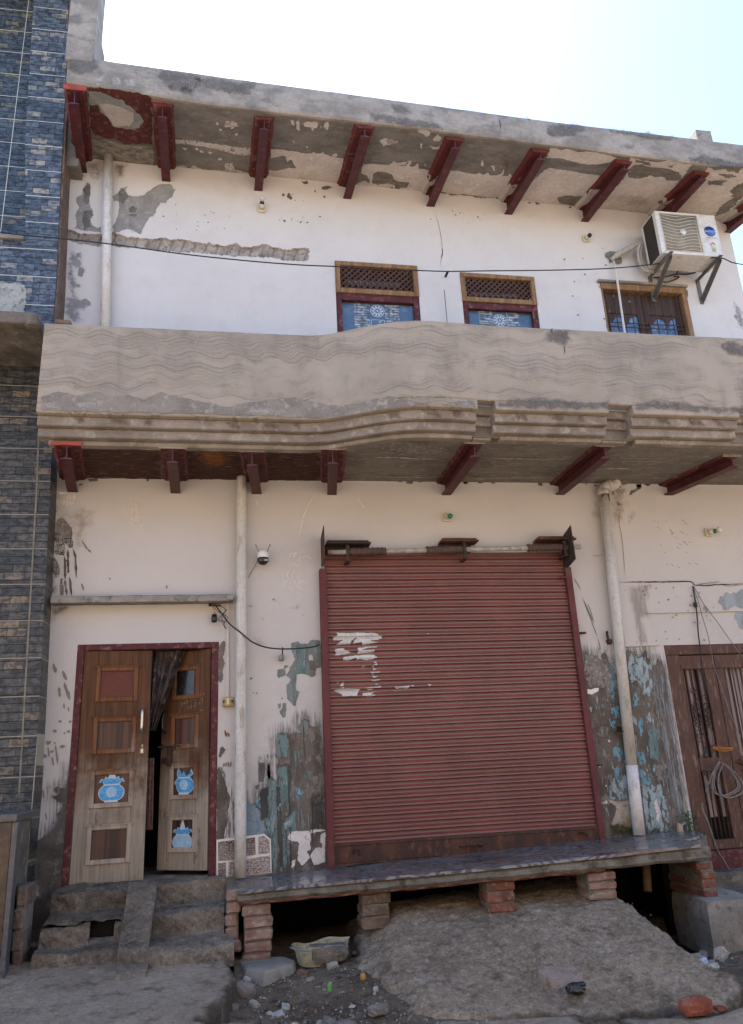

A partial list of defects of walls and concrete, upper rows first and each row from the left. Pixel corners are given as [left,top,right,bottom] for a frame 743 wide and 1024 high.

peeling [87,87,156,166]
peeling [418,129,441,150]
spalling [68,183,310,261]
peeling [357,161,429,191]
peeling [441,153,512,199]
peeling [521,148,616,208]
peeling [599,158,692,213]
peeling [676,166,743,220]
peeling [53,449,162,596]
peeling [672,589,743,629]
peeling [216,640,326,874]
peeling [582,631,688,838]